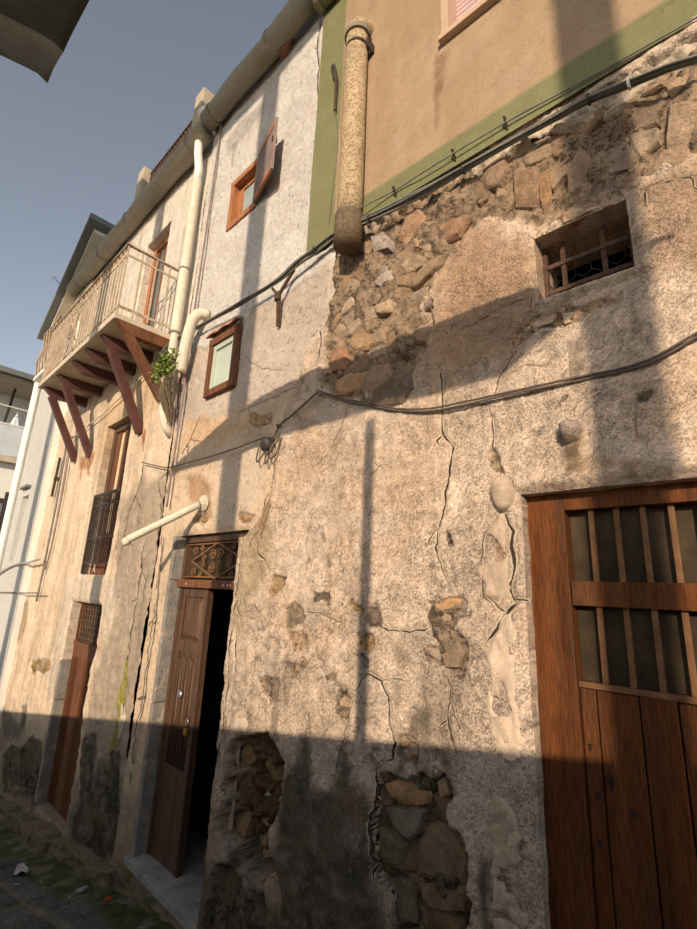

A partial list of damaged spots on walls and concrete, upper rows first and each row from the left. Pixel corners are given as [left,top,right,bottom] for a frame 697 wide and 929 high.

spalling [317,31,697,406]
crack [428,365,455,583]
water stain [3,707,26,738]
water stain [71,733,119,858]
crack [119,464,168,786]
spalling [204,732,285,929]
spalling [259,591,331,703]
water stain [273,744,382,929]
crack [333,672,407,902]
spalling [372,733,472,929]
crack [478,513,530,642]
flaking render [485,613,524,761]